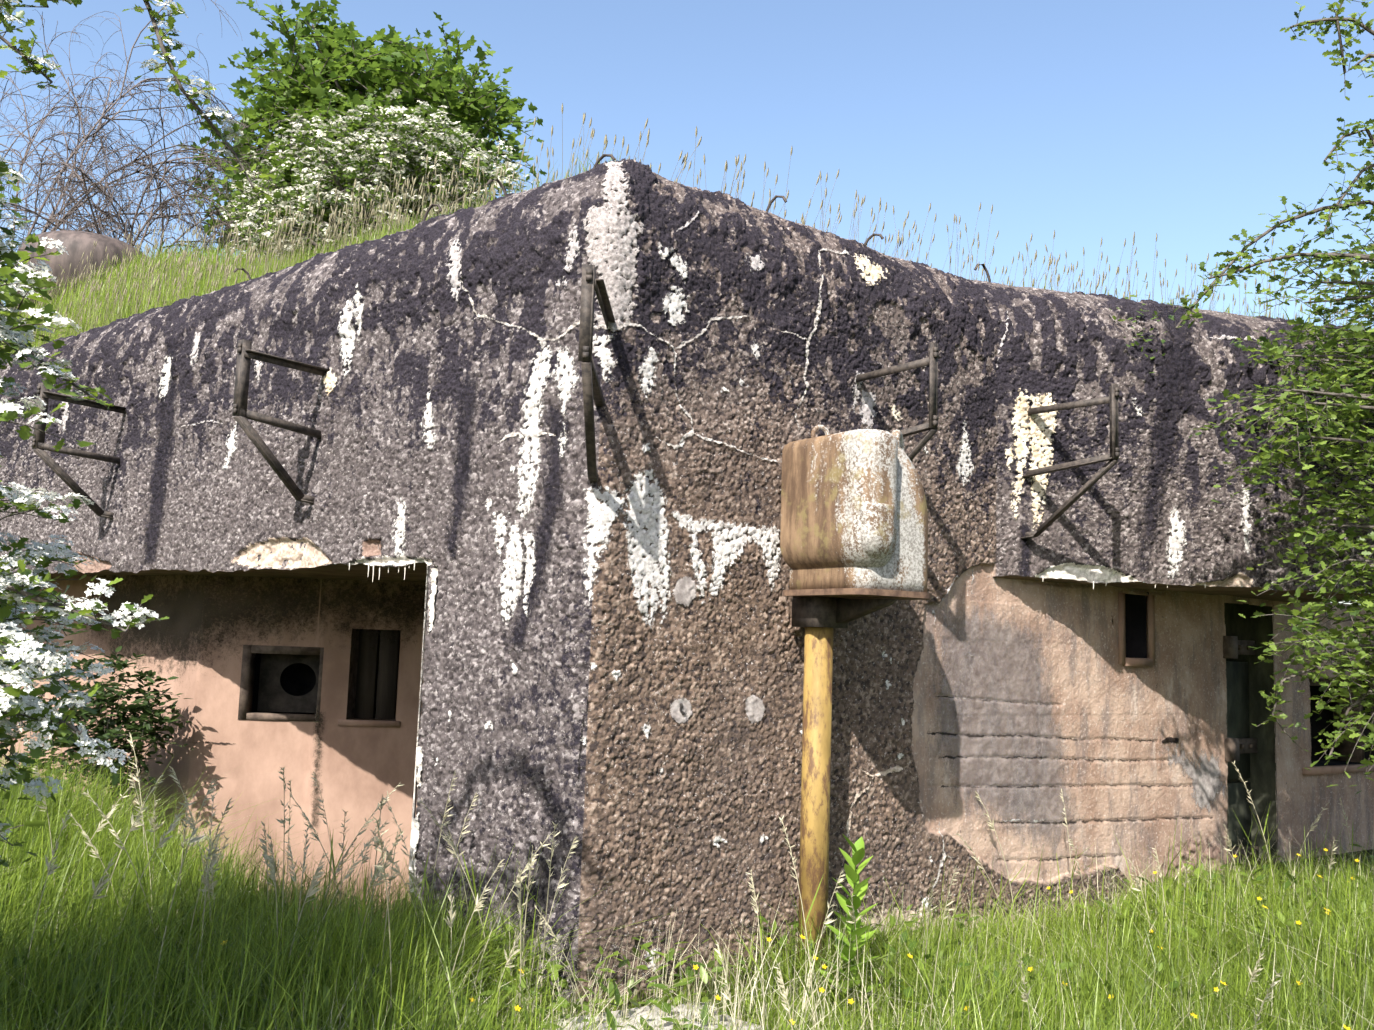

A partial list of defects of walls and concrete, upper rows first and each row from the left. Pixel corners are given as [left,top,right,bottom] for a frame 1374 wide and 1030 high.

crack [457,277,782,462]
crack [781,248,861,429]
spalling [231,537,333,570]
leakage [445,374,477,558]
leakage [485,341,579,674]
efflorescence [582,469,781,629]
leakage [1005,388,1057,577]
spalling [1035,562,1138,583]
spalling [1191,572,1253,587]
spalling [350,538,438,893]
spalling [1156,837,1222,881]